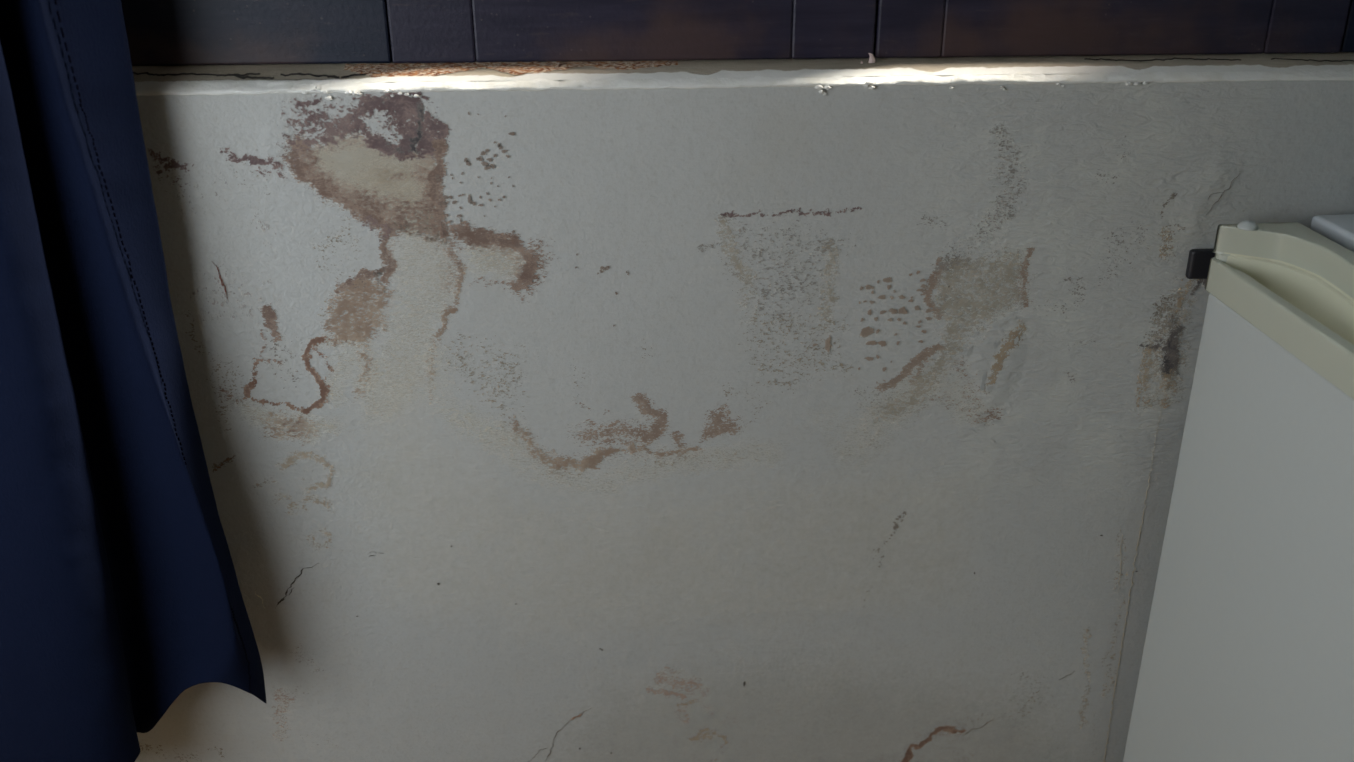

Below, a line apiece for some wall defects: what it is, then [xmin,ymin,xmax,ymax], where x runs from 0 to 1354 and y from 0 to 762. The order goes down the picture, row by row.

leakage [220,92,1185,479]
leakage [1136,279,1207,415]
crack [530,708,591,761]